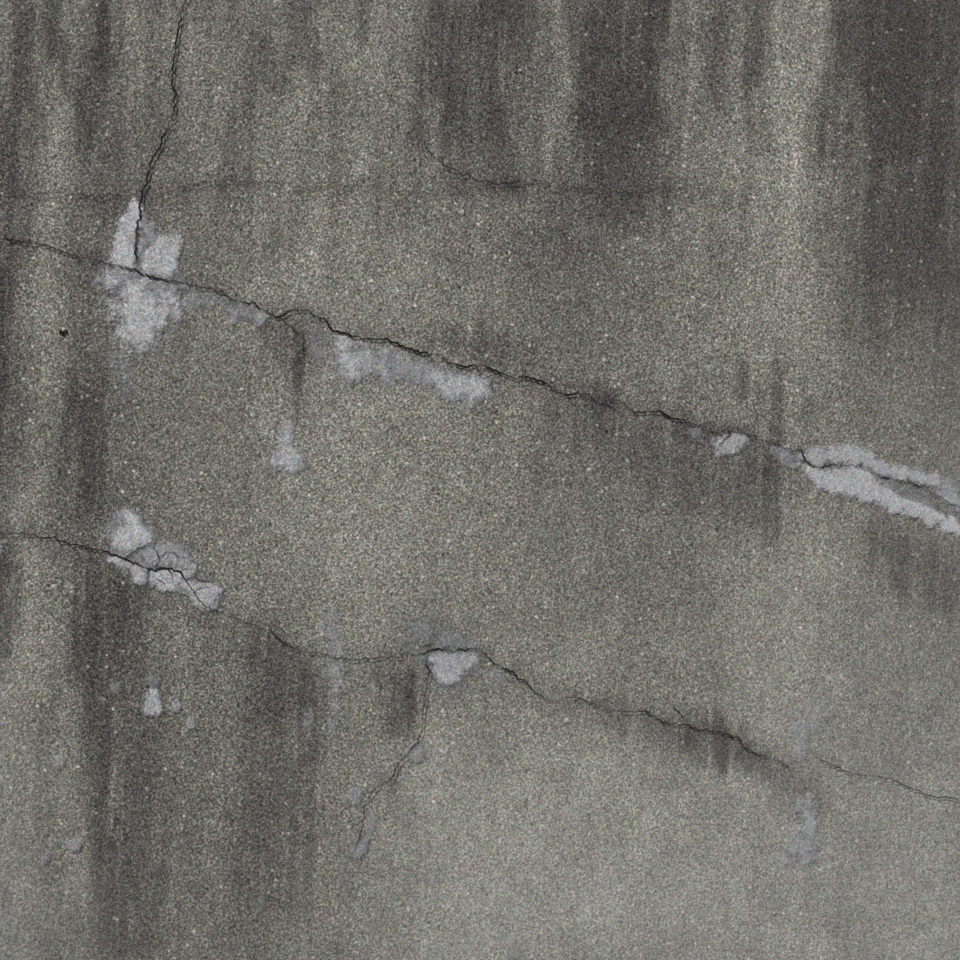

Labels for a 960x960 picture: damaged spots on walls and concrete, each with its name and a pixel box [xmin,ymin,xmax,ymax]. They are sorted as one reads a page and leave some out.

damp [587,0,666,220]
damp [866,0,950,310]
crack [3,0,750,443]
damp [329,334,491,409]
crack [794,449,834,469]
crack [11,532,211,602]
crack [239,619,296,649]
crack [319,653,398,661]
damp [427,650,479,685]
crack [356,643,589,845]
crack [628,705,787,766]
crack [888,778,952,799]